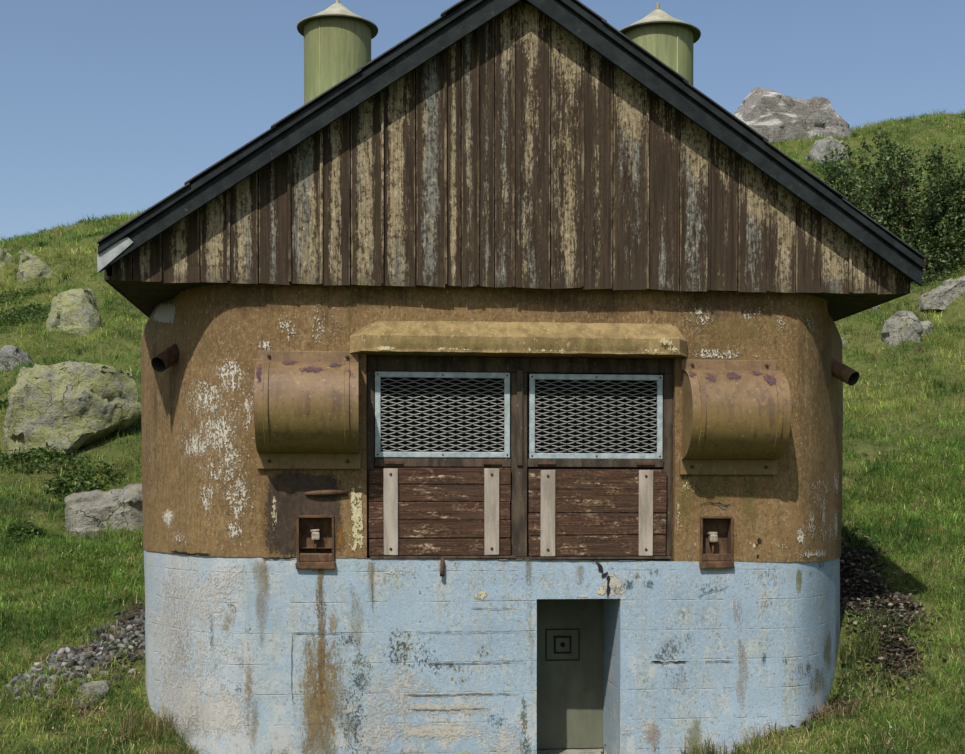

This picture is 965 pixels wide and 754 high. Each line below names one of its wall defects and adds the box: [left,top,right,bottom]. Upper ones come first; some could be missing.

peeling [282,360,353,376]
peeling [178,353,262,538]
peeling [776,470,839,559]
crack [591,560,610,598]
corrosion [300,570,337,754]
water stain [386,629,464,682]